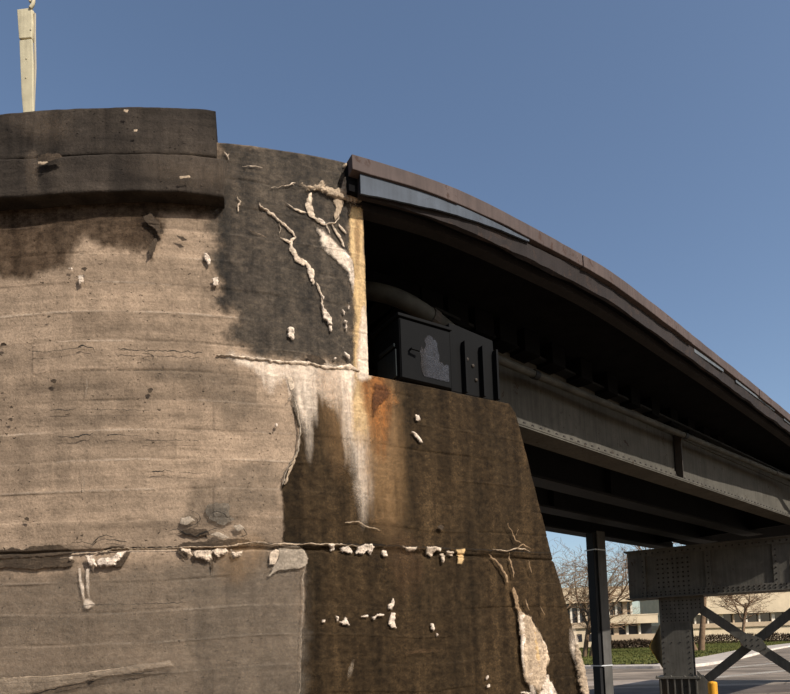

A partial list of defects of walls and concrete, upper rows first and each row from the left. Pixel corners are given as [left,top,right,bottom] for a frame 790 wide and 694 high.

crack [237,182,346,304]
water stain [0,143,583,694]
crack [282,394,301,485]
corrosion [354,376,397,497]
peeling [269,546,308,576]
crack [72,521,550,573]
crack [298,567,306,693]